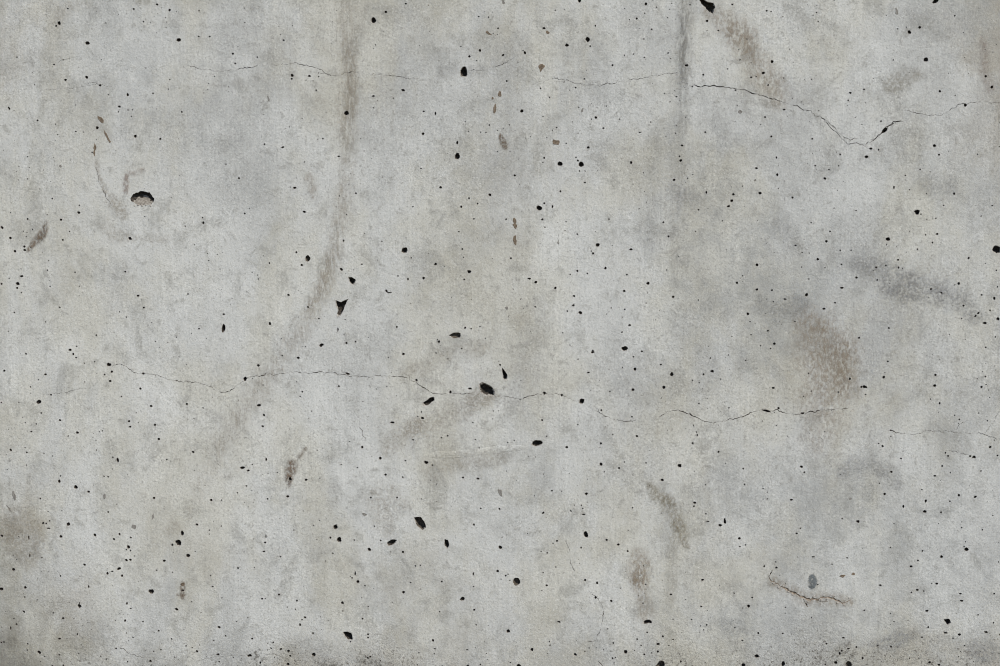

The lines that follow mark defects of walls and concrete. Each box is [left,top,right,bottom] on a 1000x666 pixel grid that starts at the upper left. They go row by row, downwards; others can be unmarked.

crack [537,72,999,145]
crack [660,408,848,423]
crack [768,571,851,607]